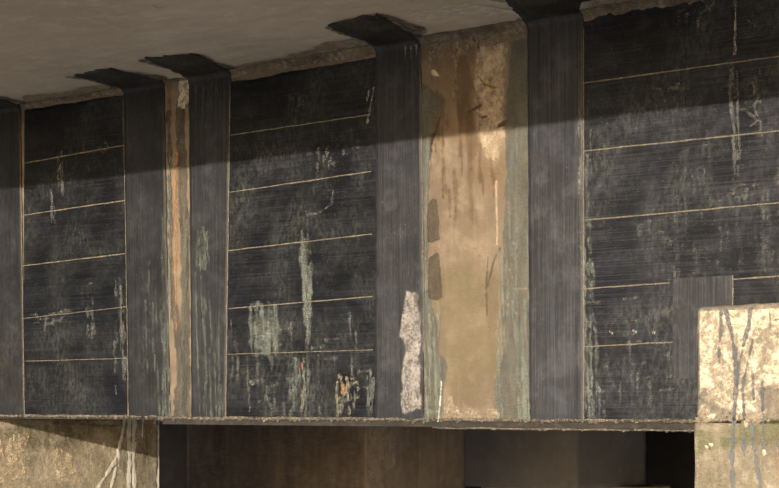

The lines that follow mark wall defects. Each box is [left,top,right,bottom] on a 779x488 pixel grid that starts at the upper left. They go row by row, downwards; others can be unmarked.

water stain [97,419,144,488]
water stain [154,100,208,488]
water stain [421,84,448,422]
water stain [457,38,530,422]
water stain [717,307,766,488]